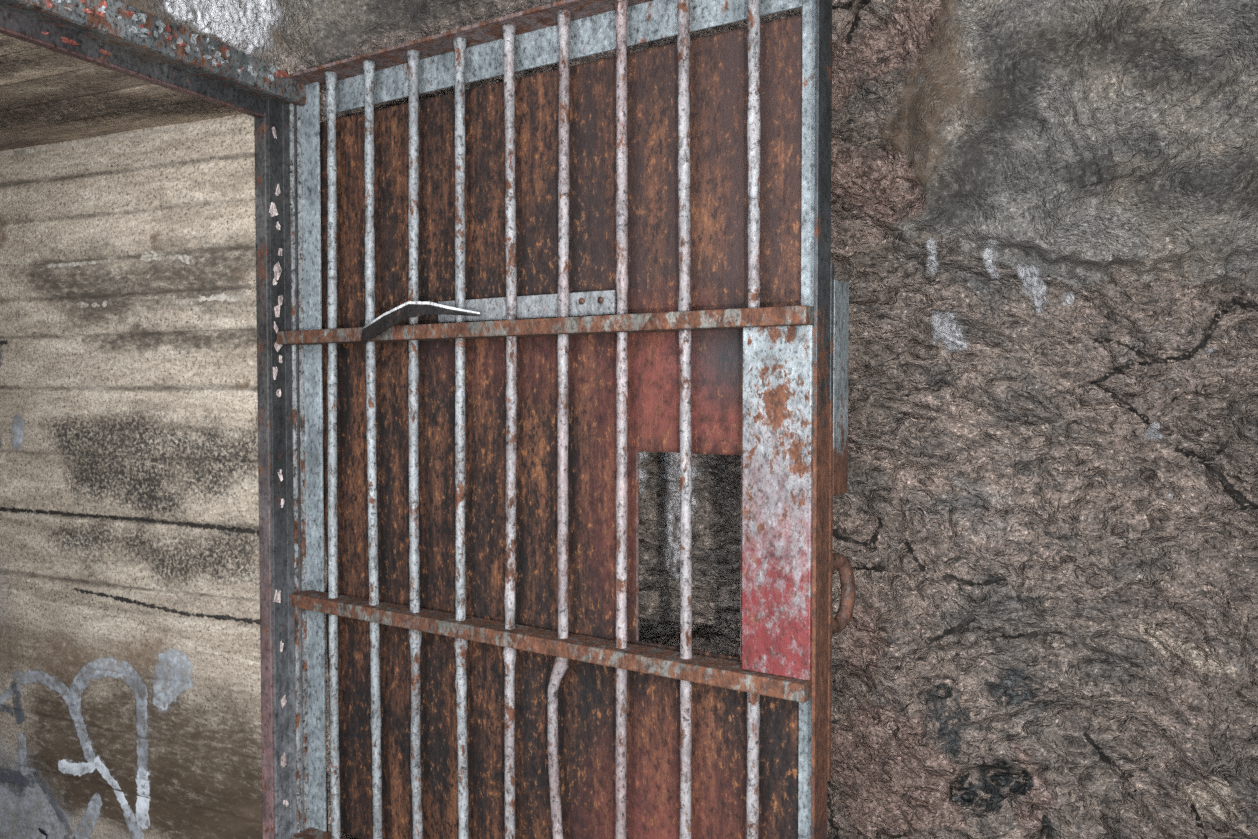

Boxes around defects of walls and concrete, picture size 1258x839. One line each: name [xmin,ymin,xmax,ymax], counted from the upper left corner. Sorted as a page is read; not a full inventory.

crack [1090,298,1258,424]
water stain [51,413,258,580]
crack [1175,436,1258,513]